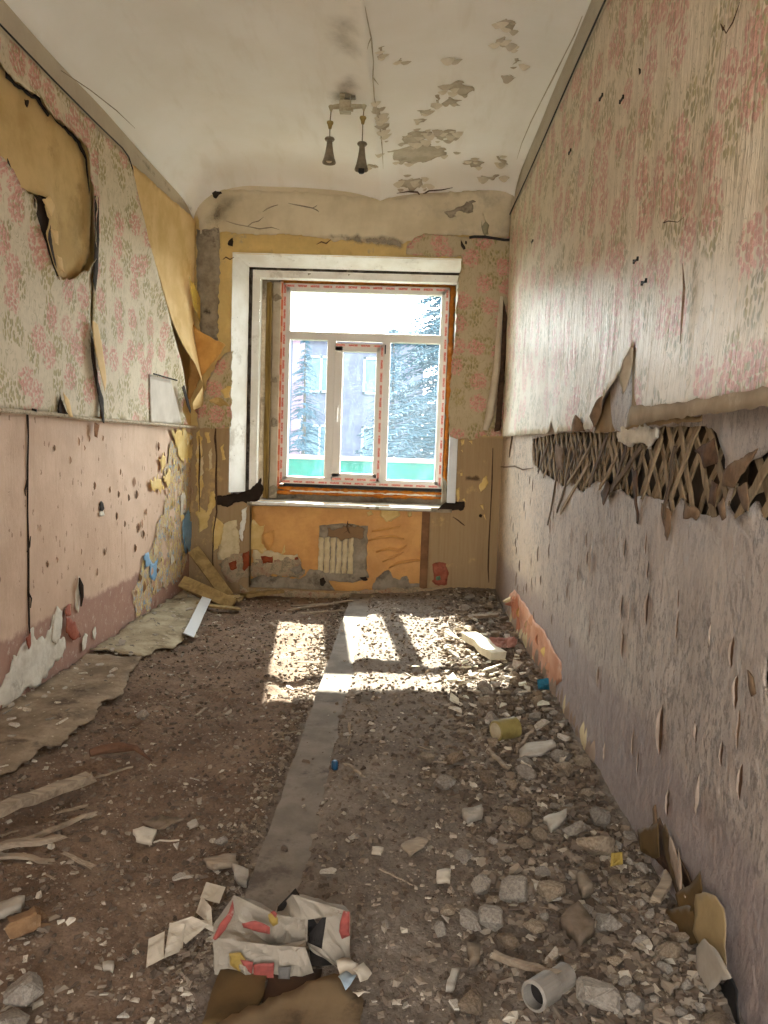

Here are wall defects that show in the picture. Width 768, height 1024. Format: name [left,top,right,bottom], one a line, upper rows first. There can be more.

crack [365,8,383,160]
peeling [367,80,509,192]
peeling [488,19,530,84]
crack [227,203,319,230]
spalling [445,200,489,236]
peeling [132,165,233,410]
peeling [99,427,449,618]
spalling [748,453,768,487]
spalling [0,577,96,708]
peeling [427,589,595,763]
peeling [637,805,740,1024]